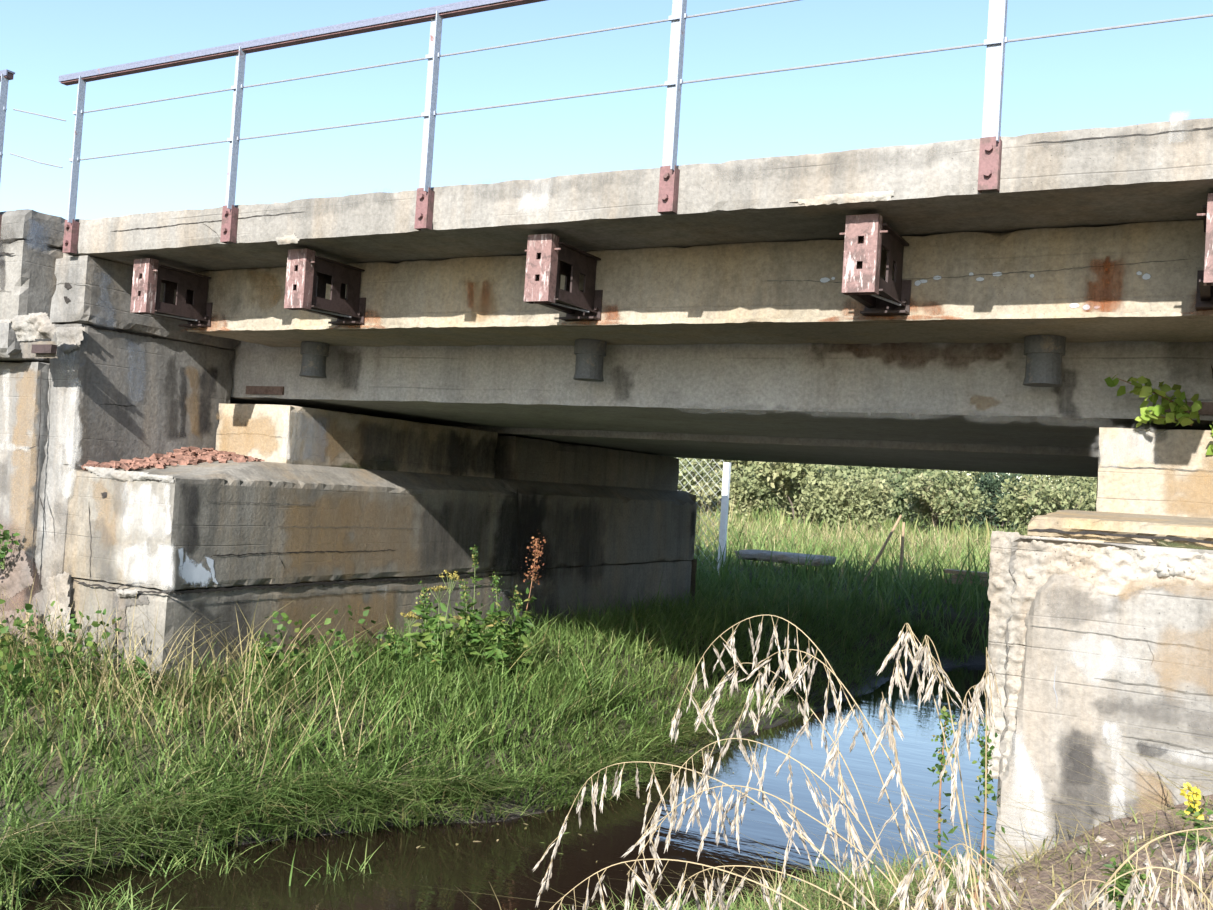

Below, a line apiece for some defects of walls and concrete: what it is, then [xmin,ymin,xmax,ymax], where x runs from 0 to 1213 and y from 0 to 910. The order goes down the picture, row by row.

rust [1089,257,1121,311]
rust [837,342,1008,367]
leakage [168,362,341,460]
peeling [205,557,218,584]
crack [73,501,516,664]
spalling [985,531,1213,779]
leakage [1016,723,1123,842]